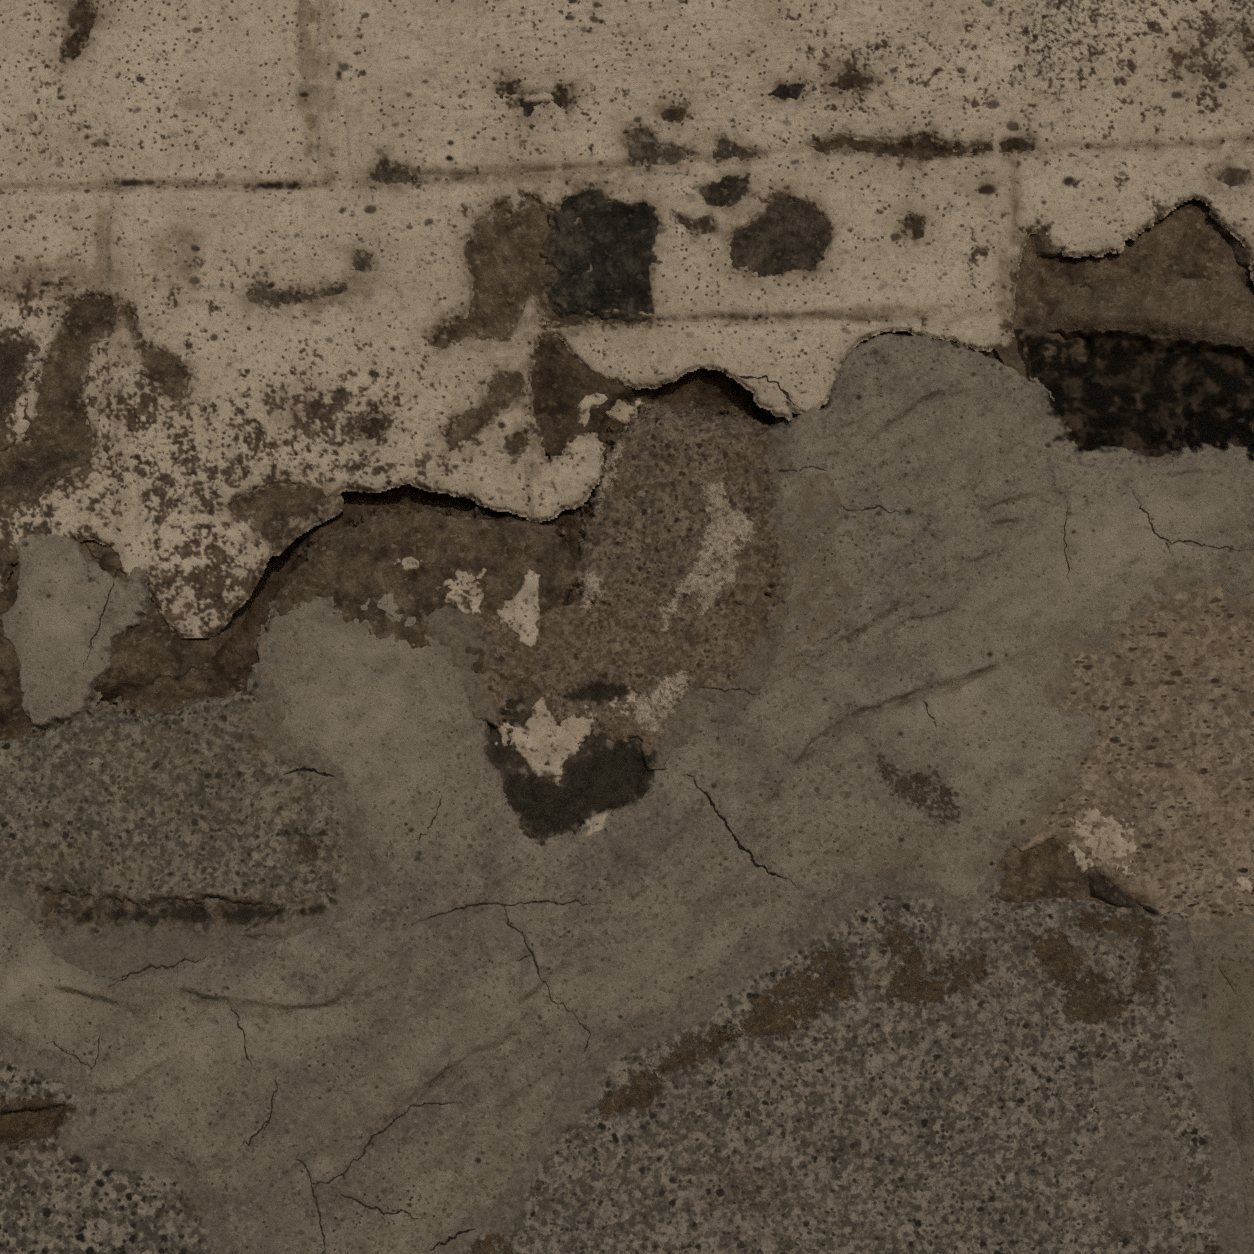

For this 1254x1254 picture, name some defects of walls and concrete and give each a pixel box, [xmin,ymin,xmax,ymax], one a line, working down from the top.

spalling [673,176,749,235]
spalling [713,134,755,161]
spalling [729,194,833,277]
spalling [0,295,189,507]
spalling [204,190,795,698]
spalling [994,199,1254,457]
crack [413,797,442,841]
spalling [486,670,692,846]
crack [686,774,805,891]
crack [414,899,608,1053]
crack [230,1007,278,1147]
crack [296,1102,476,1254]